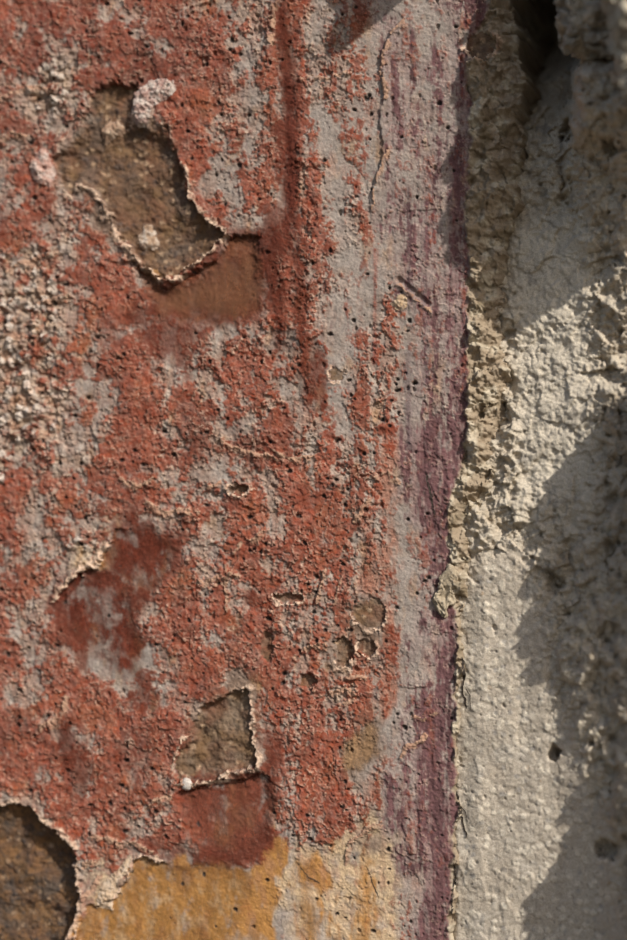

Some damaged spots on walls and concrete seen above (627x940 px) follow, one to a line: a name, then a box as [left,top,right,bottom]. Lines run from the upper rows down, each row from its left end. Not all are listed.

flaking render [53,84,230,286]
flaking render [117,476,154,491]
flaking render [143,500,200,518]
peeling [49,526,171,677]
flaking render [144,684,273,850]
flaking render [0,795,248,940]